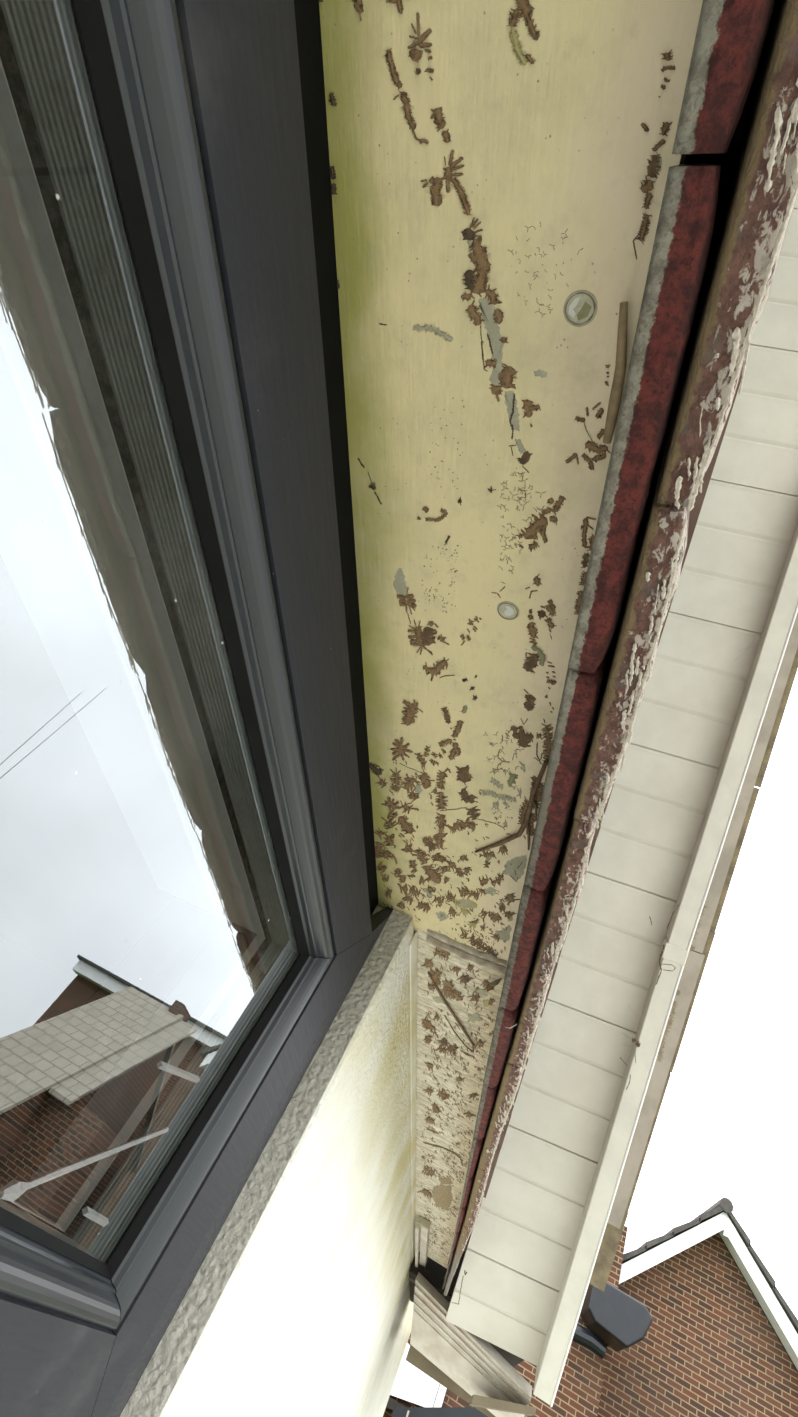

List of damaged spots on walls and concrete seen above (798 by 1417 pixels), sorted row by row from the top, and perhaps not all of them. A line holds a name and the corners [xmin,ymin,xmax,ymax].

peeling [569,297,581,318]
peeling [412,324,453,342]
peeling [479,297,526,454]
peeling [393,568,408,596]
peeling [481,761,525,827]
peeling [503,855,527,882]
peeling [460,917,513,958]
peeling [419,1166,453,1211]